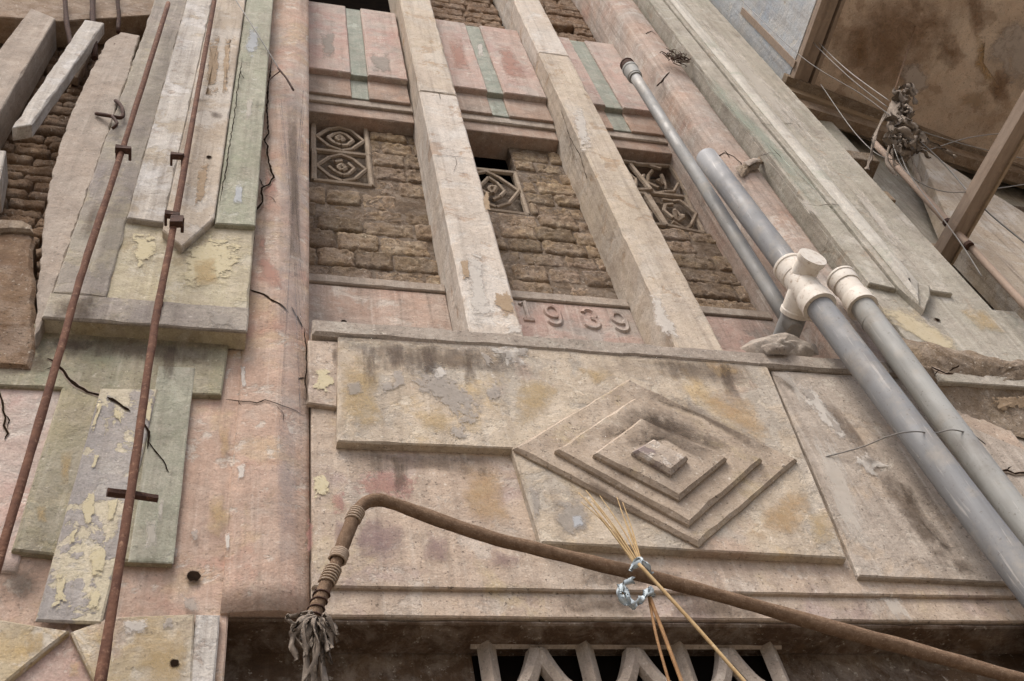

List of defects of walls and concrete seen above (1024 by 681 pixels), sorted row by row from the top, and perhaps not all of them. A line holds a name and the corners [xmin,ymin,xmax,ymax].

crack [219,56,276,248]
peeling [132,233,156,267]
peeling [181,235,241,287]
peeling [460,260,469,279]
peeling [494,292,514,317]
crack [0,392,10,440]
crack [45,358,169,472]
crack [226,290,308,420]
peeling [304,352,336,397]
peeling [381,362,501,438]
peeling [69,490,95,544]
peeling [51,570,71,609]